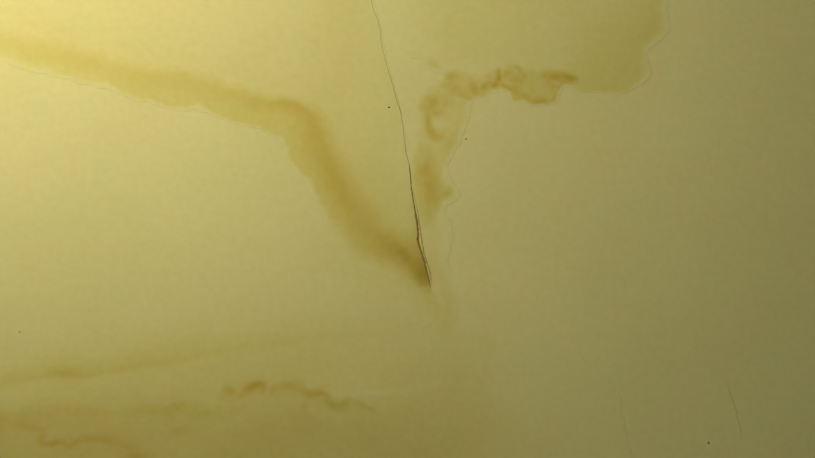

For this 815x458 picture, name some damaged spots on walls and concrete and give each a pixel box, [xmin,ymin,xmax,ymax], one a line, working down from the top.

leakage [0,0,670,390]
crack [367,0,432,286]
leakage [0,275,631,458]